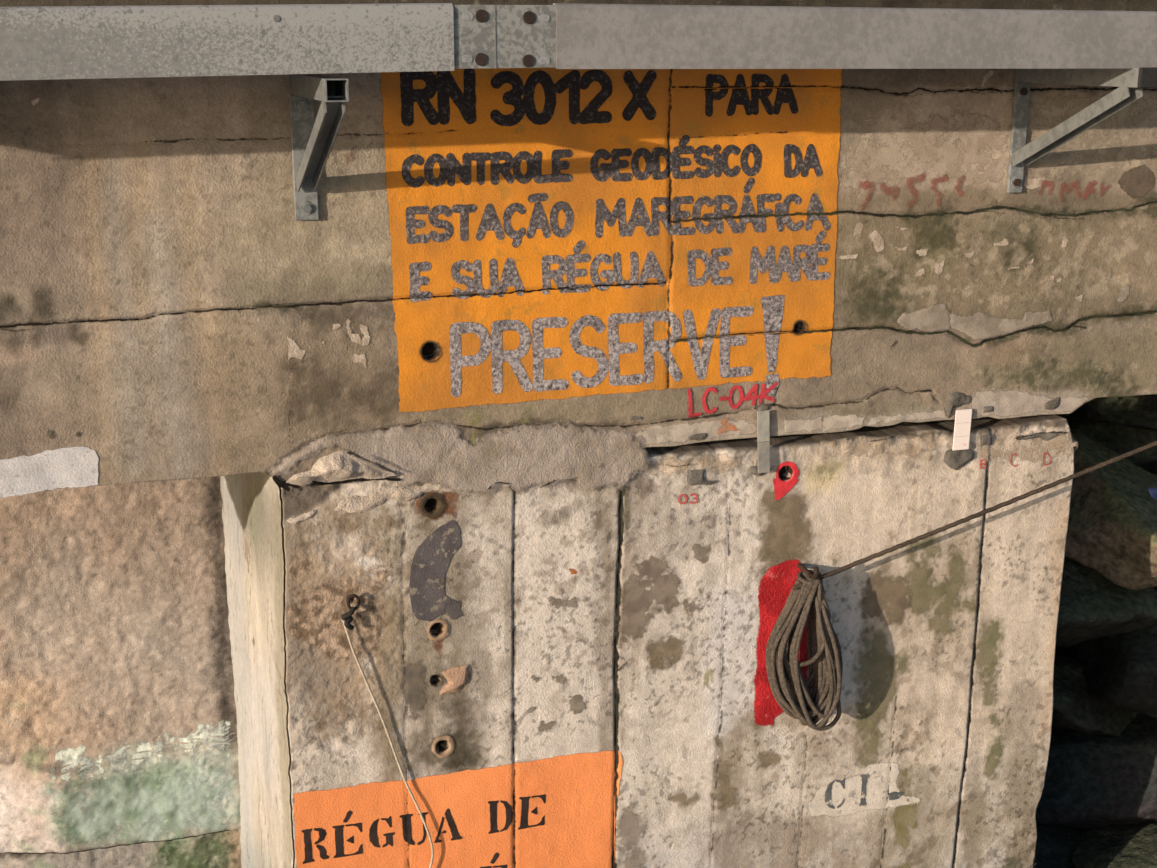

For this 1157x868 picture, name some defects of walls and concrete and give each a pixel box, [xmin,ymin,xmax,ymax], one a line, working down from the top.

crack [0,69,1157,388]
spalling [897,303,1053,340]
crack [289,365,422,452]
crack [457,387,932,431]
crack [267,471,400,492]
spalling [286,450,453,513]
spalling [286,510,316,524]
damp [862,571,911,633]
damp [907,536,976,633]
damp [856,715,879,766]
damp [984,716,1003,777]